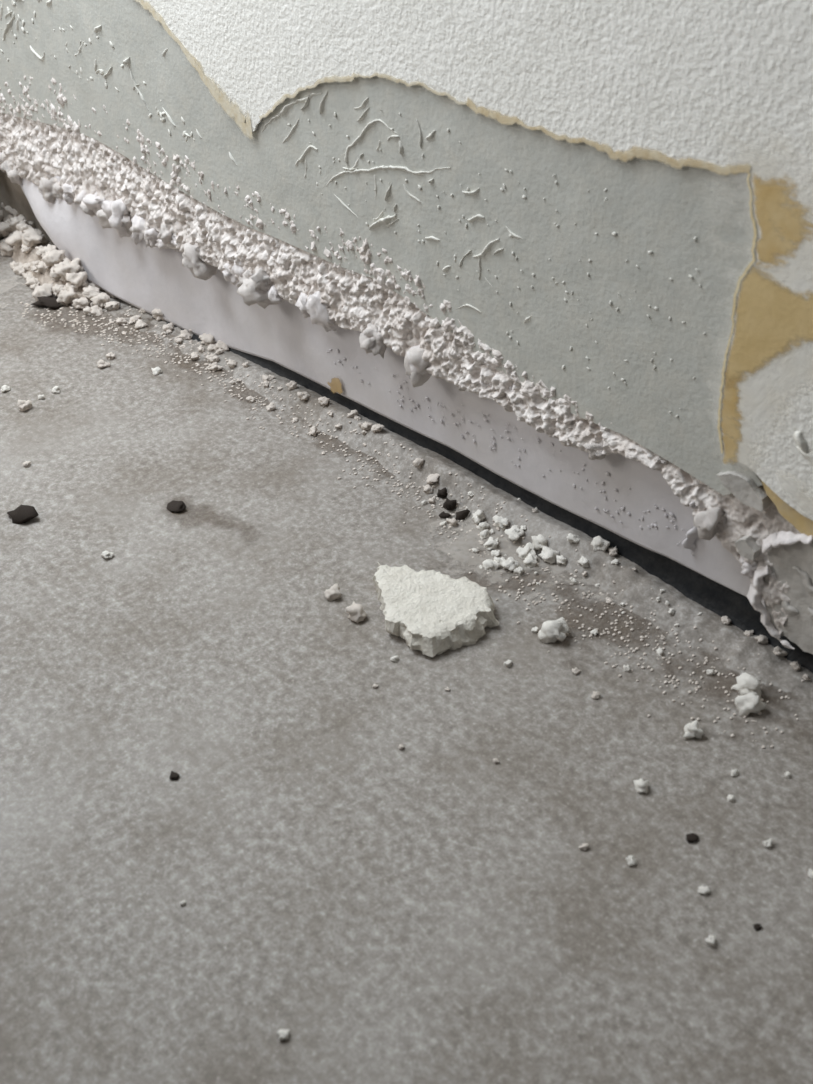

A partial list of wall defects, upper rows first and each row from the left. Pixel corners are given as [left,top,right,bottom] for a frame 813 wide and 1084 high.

water stain [328,378,342,394]
peeling [0,0,813,636]